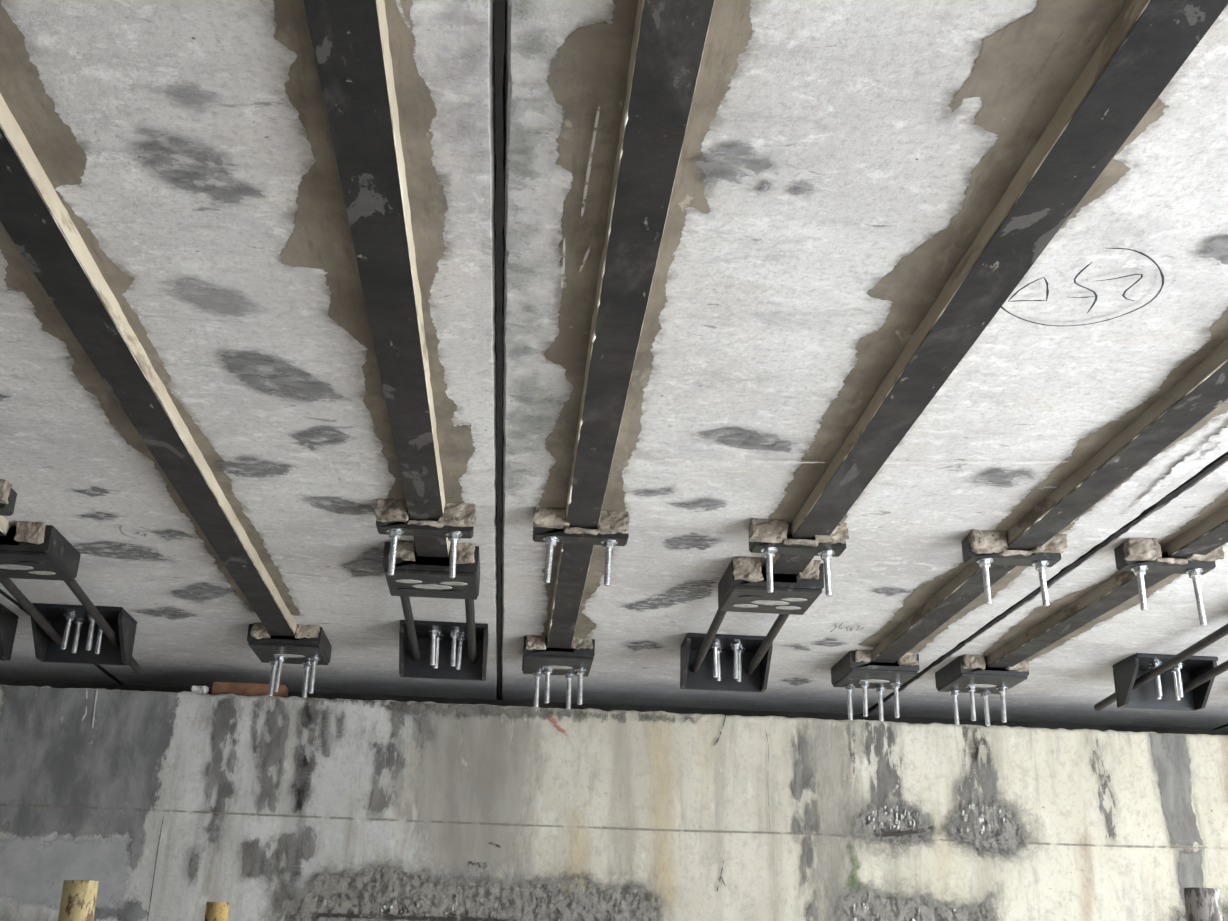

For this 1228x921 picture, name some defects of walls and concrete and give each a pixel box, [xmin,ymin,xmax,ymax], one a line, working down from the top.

leakage [0,686,179,921]
leakage [243,826,316,918]
leakage [189,696,699,881]
spalling [271,863,662,921]
spalling [832,886,996,921]
spalling [852,796,1032,858]
leakage [1149,733,1204,906]